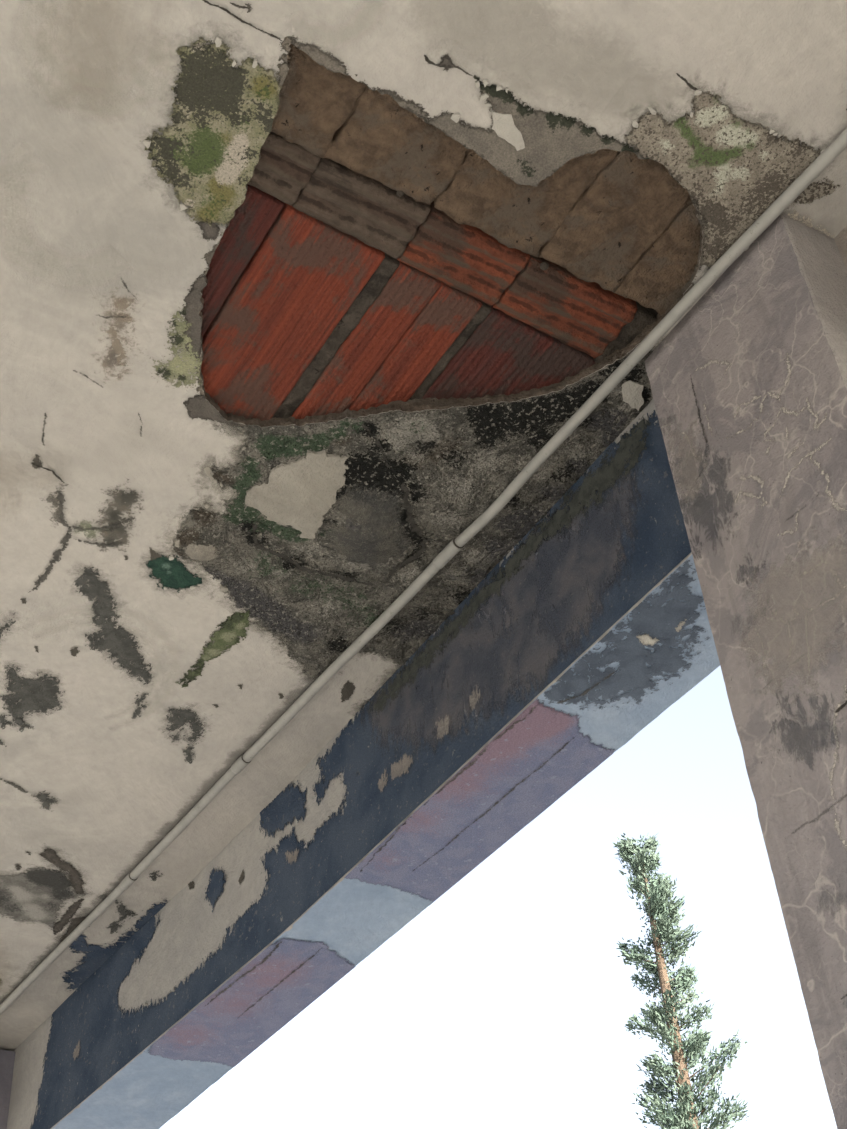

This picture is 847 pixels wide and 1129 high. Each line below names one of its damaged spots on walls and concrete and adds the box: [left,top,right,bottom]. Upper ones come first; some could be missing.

crack [202,0,282,41]
spalling [182,35,845,428]
crack [682,354,847,536]
damp [96,479,143,552]
damp [70,567,153,719]
damp [0,778,58,809]
damp [0,663,65,747]
damp [162,706,207,764]
peeling [30,410,692,1129]
crack [829,689,847,848]
damp [0,849,90,942]